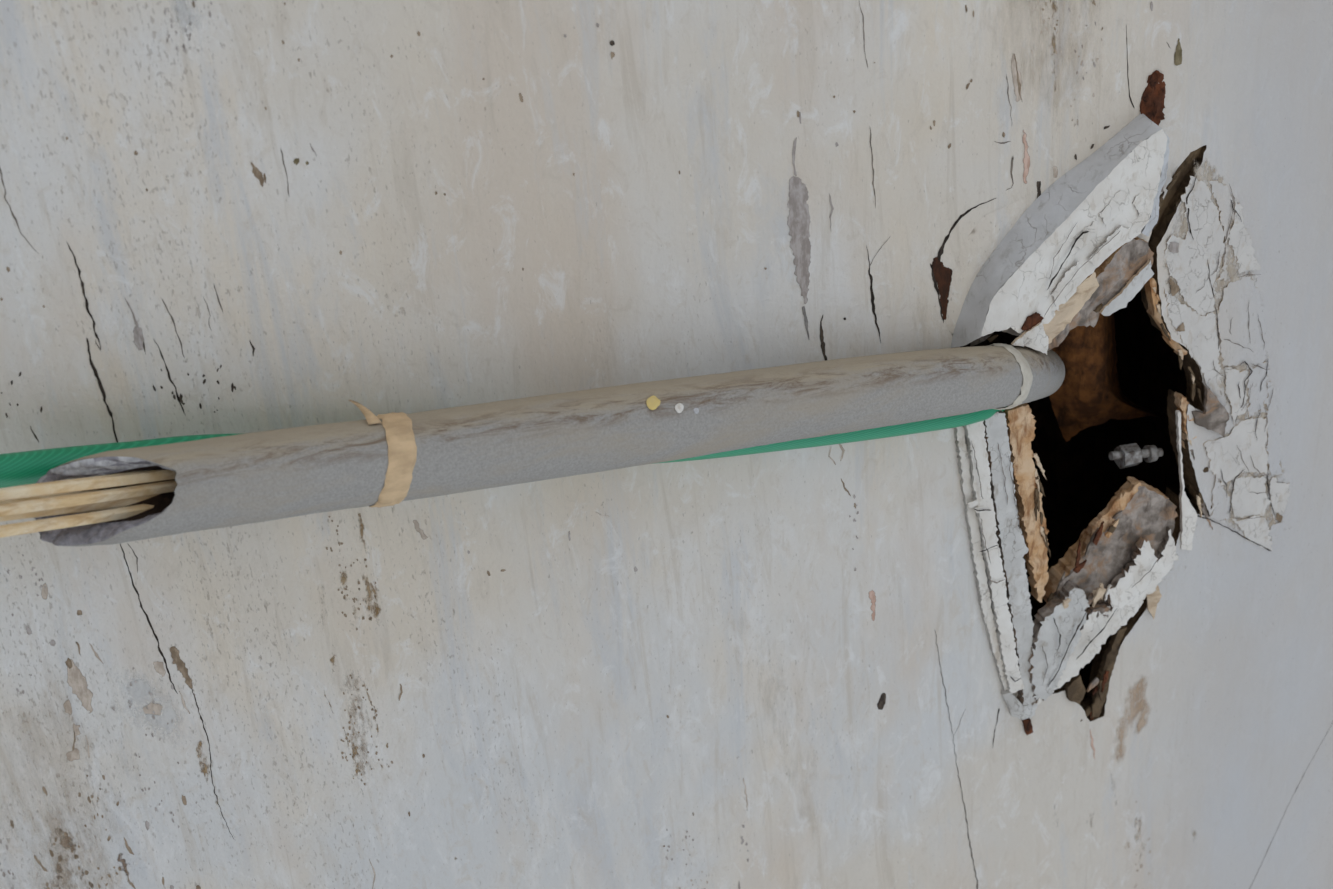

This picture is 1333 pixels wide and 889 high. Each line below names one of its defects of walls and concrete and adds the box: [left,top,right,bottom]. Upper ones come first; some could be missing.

peeling [1006,54,1058,198]
peeling [961,284,1049,355]
peeling [1027,162,1290,572]
spalling [1023,557,1046,621]
peeling [1146,585,1162,619]
crack [120,544,234,839]
spalling [1079,660,1092,699]